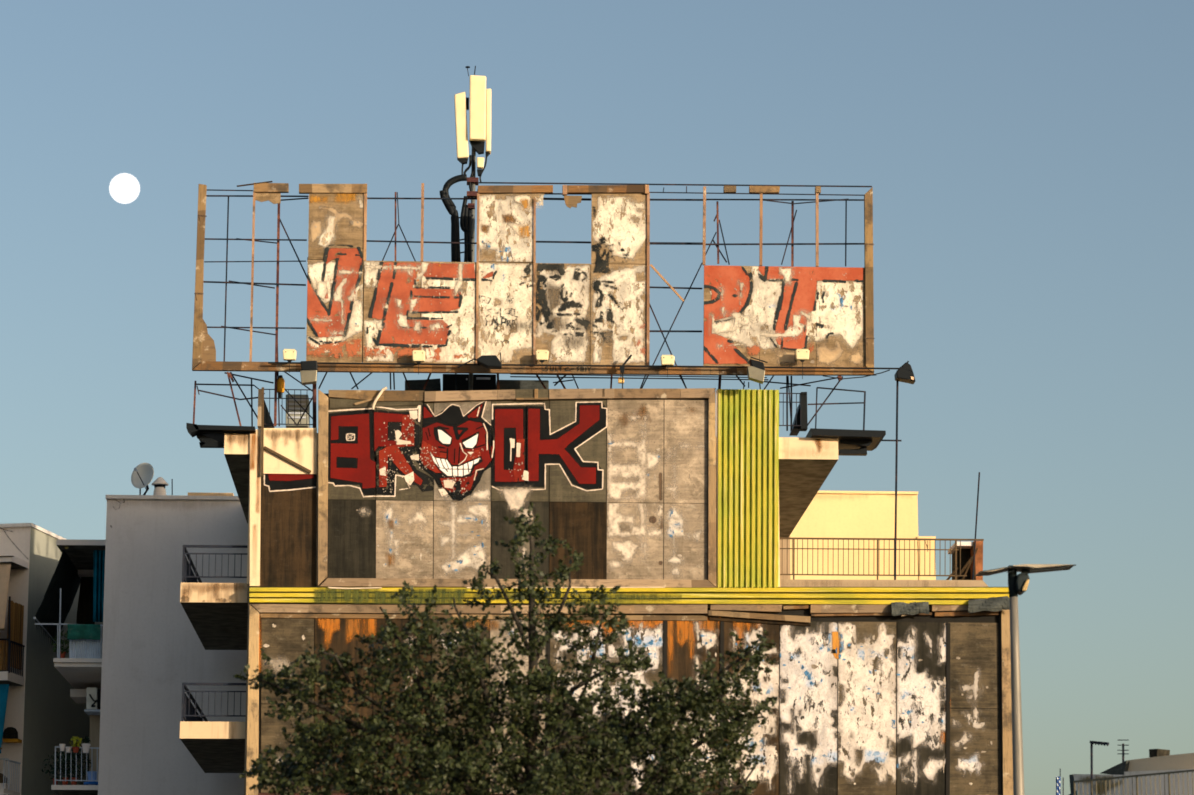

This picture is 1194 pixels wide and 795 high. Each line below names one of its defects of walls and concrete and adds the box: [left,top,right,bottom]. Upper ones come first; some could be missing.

peeling [514,194,543,210]
peeling [770,267,812,284]
peeling [313,261,472,359]
peeling [710,279,811,364]
corrosion [318,618,376,643]
corrosion [566,619,720,658]
peeling [625,623,662,654]
corrosion [734,619,761,649]
peeling [820,625,885,660]
peeling [631,755,655,789]